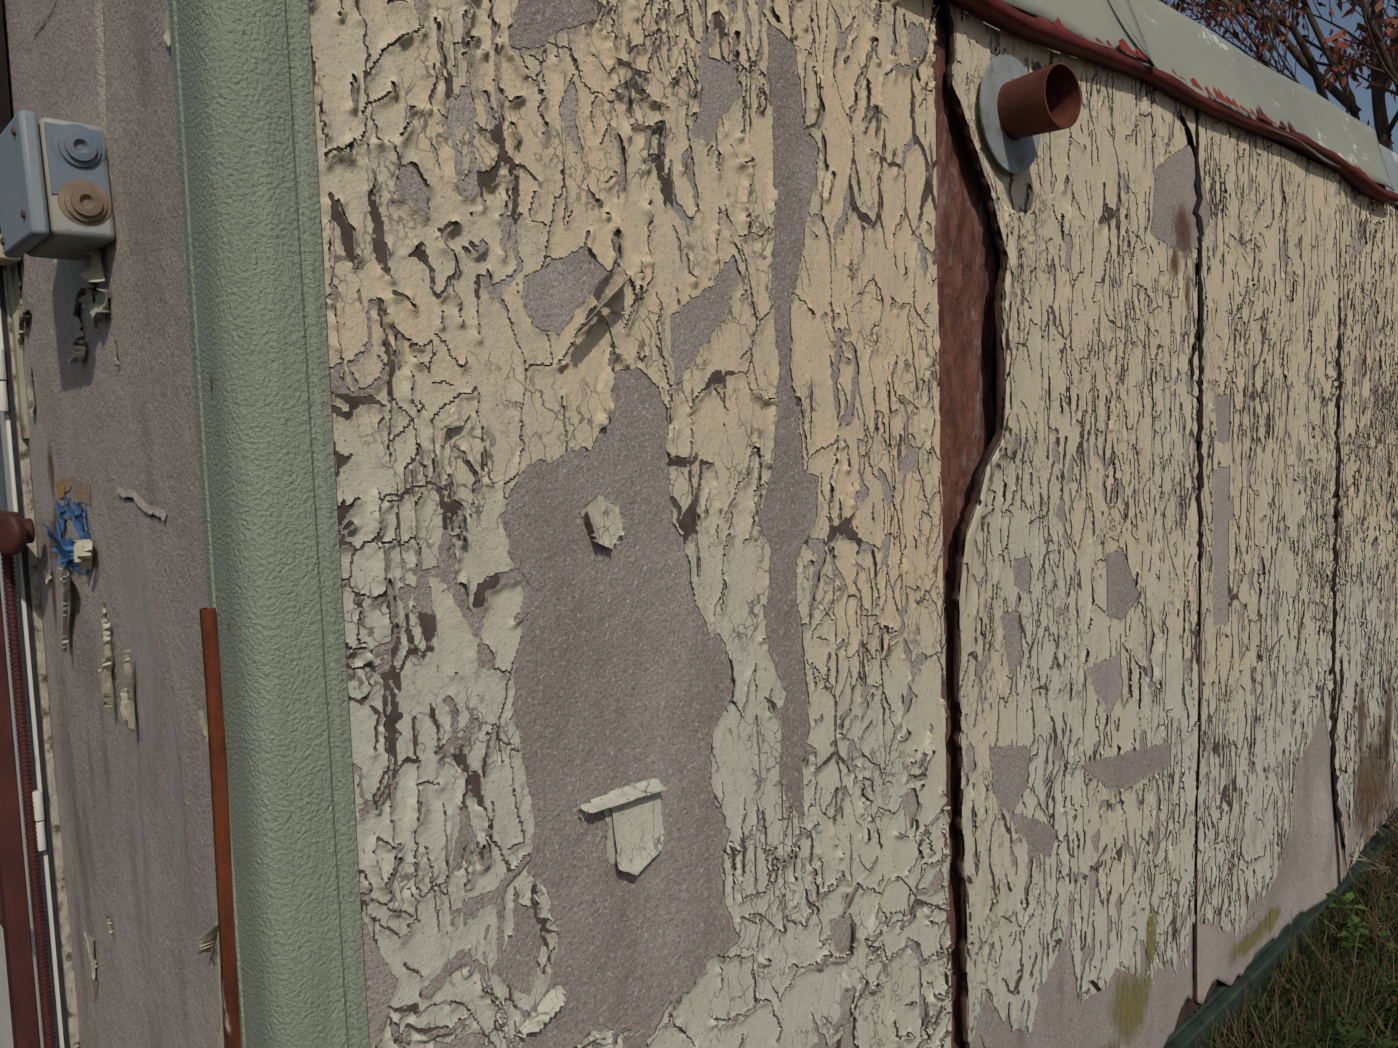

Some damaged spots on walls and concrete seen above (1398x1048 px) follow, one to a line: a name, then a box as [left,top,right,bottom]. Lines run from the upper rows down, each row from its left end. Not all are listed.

peeling [53,247,110,364]
crack [1190,112,1205,581]
peeling [42,476,93,652]
peeling [308,0,1398,1048]
crack [1330,290,1347,872]
peeling [198,699,209,752]
peeling [194,921,224,1048]